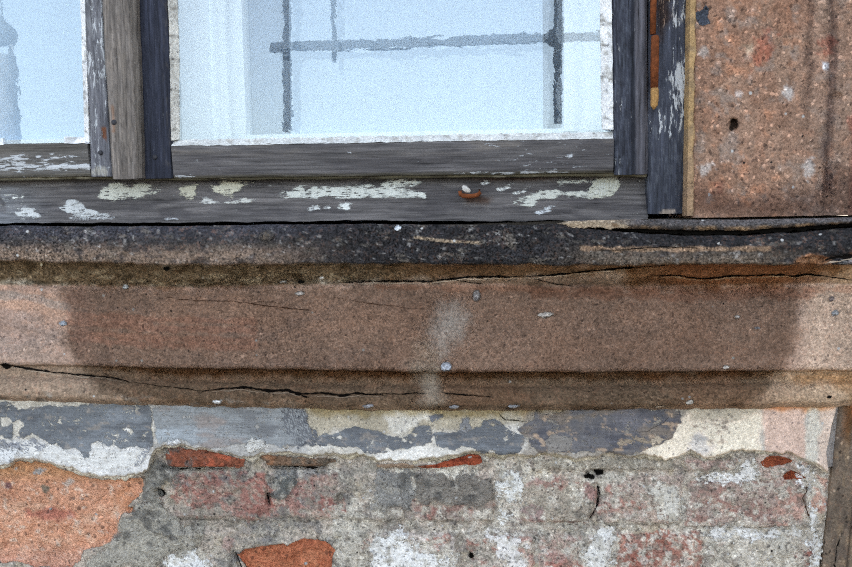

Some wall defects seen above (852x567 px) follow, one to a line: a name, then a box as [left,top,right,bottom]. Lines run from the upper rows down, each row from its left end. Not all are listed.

peeling [98,182,160,201]
peeling [179,181,256,204]
peeling [282,179,426,211]
peeling [497,177,620,215]
peeling [15,207,41,219]
peeling [59,199,115,220]
crack [335,223,852,309]
crack [166,297,304,310]
crack [0,364,524,422]
spalling [761,456,806,480]
spalling [0,401,682,567]